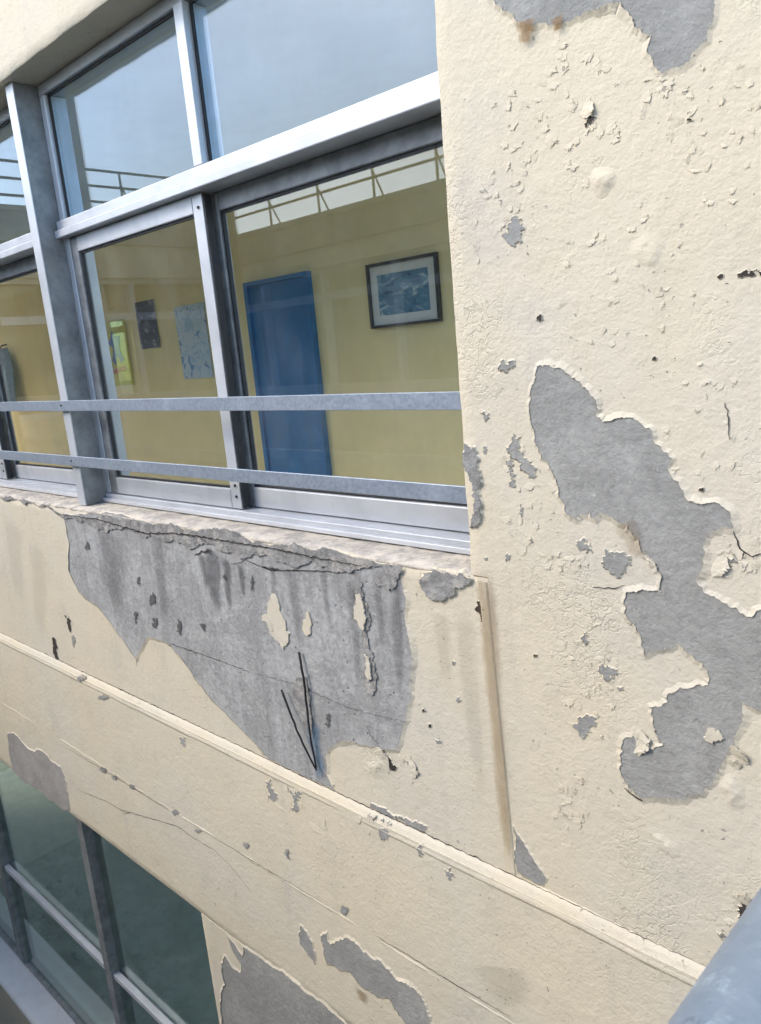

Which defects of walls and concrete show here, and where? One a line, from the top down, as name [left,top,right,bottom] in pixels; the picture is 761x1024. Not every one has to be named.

rust [520,19,532,42]
peeling [479,0,721,248]
spalling [462,441,488,528]
crack [59,514,361,573]
peeling [499,359,761,806]
spalling [0,496,475,813]
crack [2,633,706,967]
peeling [512,824,549,886]
peeling [219,930,348,1024]
peeling [298,923,433,1024]
crack [377,936,509,1017]